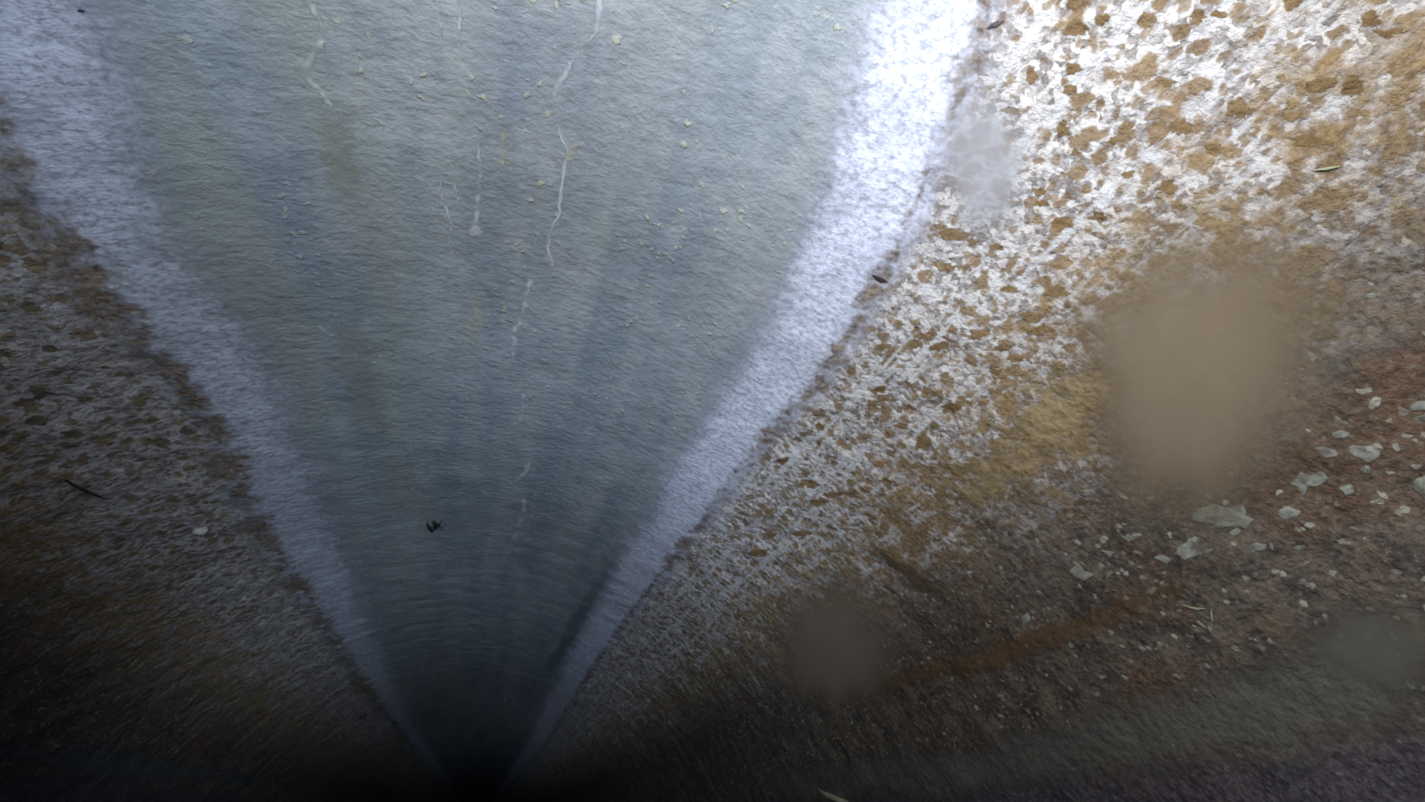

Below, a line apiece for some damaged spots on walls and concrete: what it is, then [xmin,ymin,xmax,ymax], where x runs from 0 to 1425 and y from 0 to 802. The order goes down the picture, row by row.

crack [595,0,603,19]
crack [303,0,342,106]
crack [511,129,568,424]
peeling [1410,401,1425,421]
crack [513,463,530,541]
peeling [1278,430,1380,520]
peeling [1412,475,1425,499]
peeling [1069,563,1093,581]
peeling [1099,533,1142,555]
peeling [1154,504,1267,563]